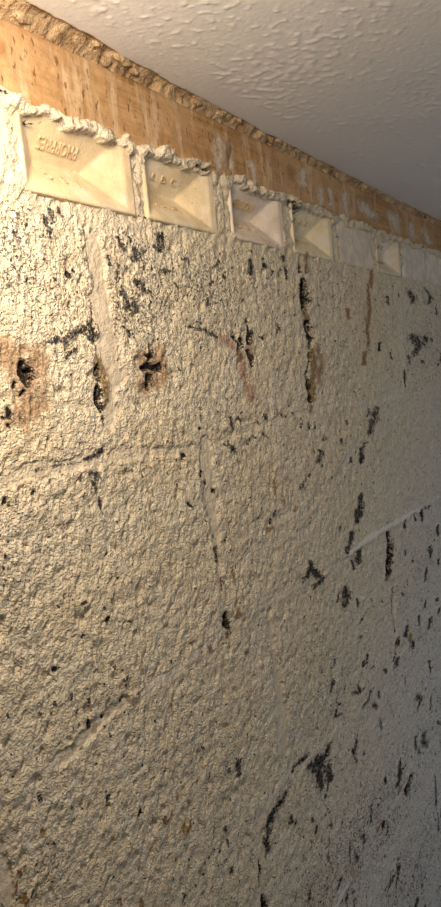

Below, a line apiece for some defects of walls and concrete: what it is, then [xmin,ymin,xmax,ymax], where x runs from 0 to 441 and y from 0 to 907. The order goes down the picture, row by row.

spalling [0,0,441,227]